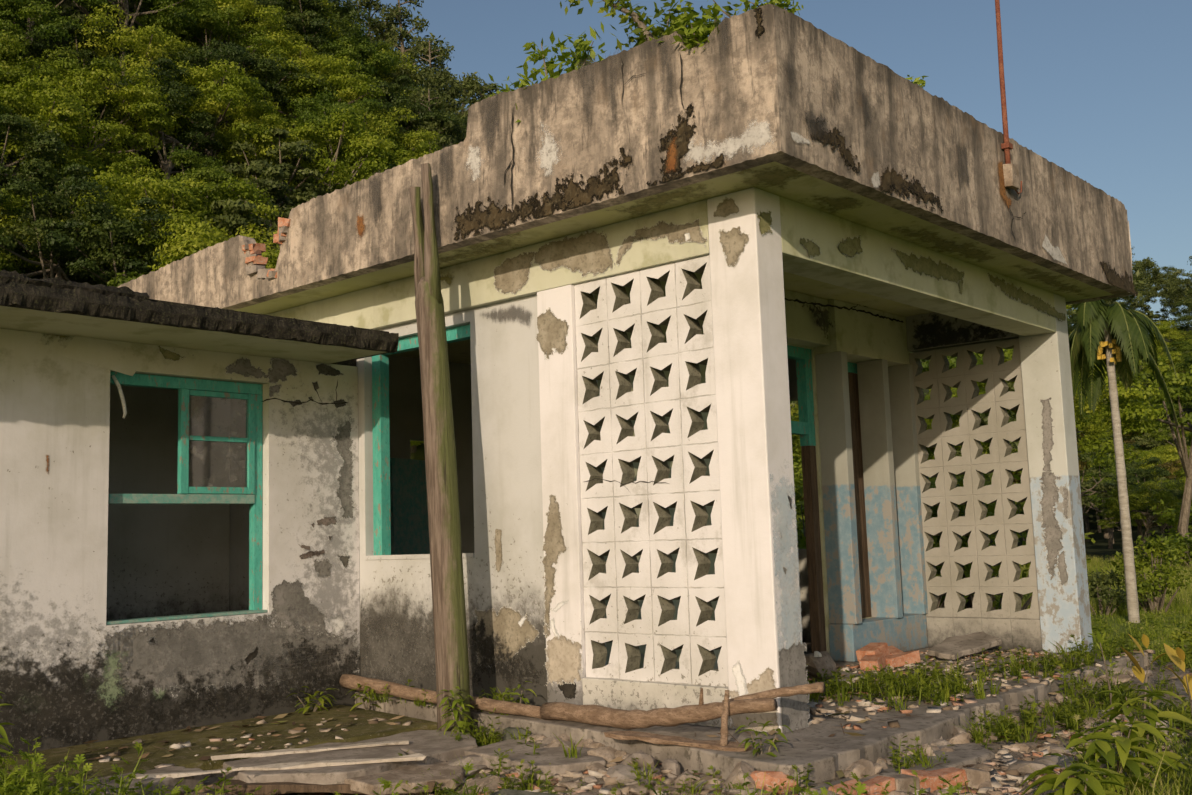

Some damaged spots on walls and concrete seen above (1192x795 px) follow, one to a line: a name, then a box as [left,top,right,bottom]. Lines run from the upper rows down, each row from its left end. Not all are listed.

rust [998,162,1012,209]
peeling [493,197,773,295]
peeling [224,357,344,407]
crack [262,381,348,405]
peeling [536,307,569,360]
crack [785,298,904,323]
peeling [299,399,355,577]
peeling [1039,397,1068,587]
water stain [0,603,436,757]
peeling [92,580,360,700]
peeling [473,495,583,699]